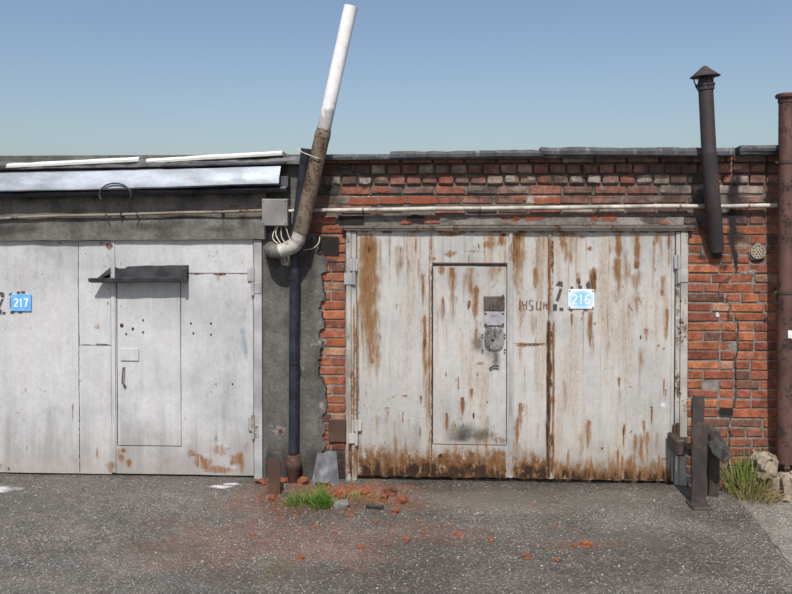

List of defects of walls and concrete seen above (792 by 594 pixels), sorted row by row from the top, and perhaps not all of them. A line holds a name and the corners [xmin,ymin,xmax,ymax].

rust [189,449,243,473]
rust [348,231,671,482]